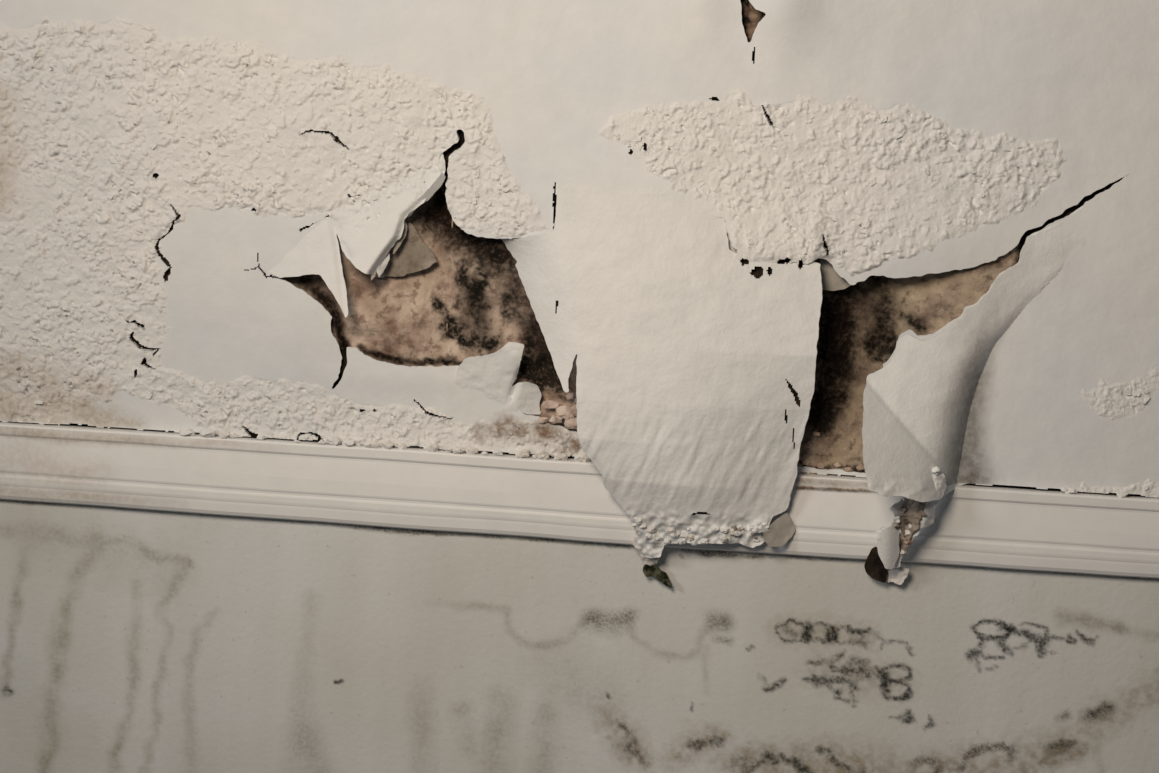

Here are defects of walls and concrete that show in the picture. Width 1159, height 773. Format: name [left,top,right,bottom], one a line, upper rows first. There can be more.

spalling [741,0,766,42]
crack [443,129,465,170]
crack [1021,175,1127,242]
crack [156,207,181,281]
peeling [0,16,1067,566]
crack [128,320,161,375]
peeling [864,466,946,585]
damp [776,618,913,723]
damp [967,620,1091,658]
damp [743,753,810,773]